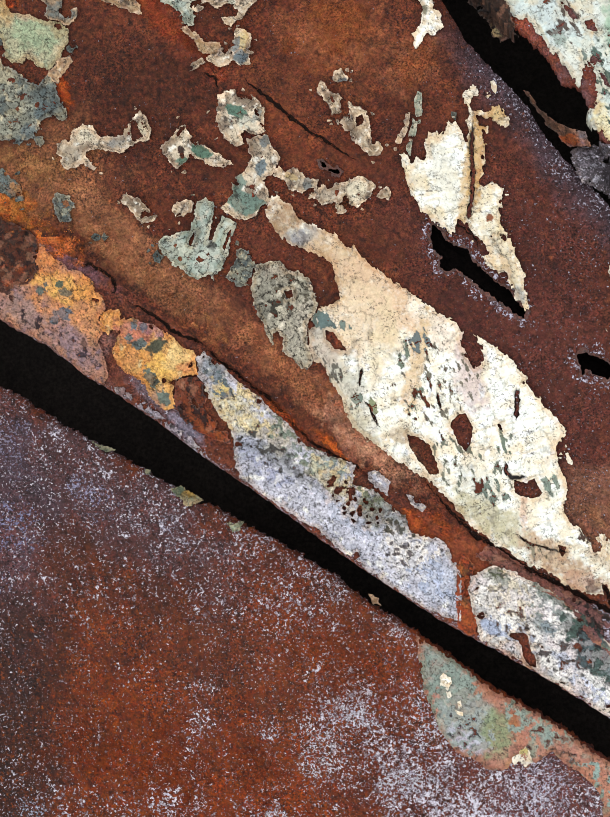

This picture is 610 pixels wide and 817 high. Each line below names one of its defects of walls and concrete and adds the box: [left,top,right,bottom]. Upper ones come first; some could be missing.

rust [467,0,519,43]
peeling [504,0,610,141]
rust [523,90,591,147]
rust [0,189,187,311]
crack [81,262,362,470]
crack [359,369,380,427]
peeling [147,68,610,595]
crack [513,390,521,419]
peeling [0,243,610,717]
crack [427,484,610,614]
rust [455,544,610,655]
peeling [416,632,610,817]